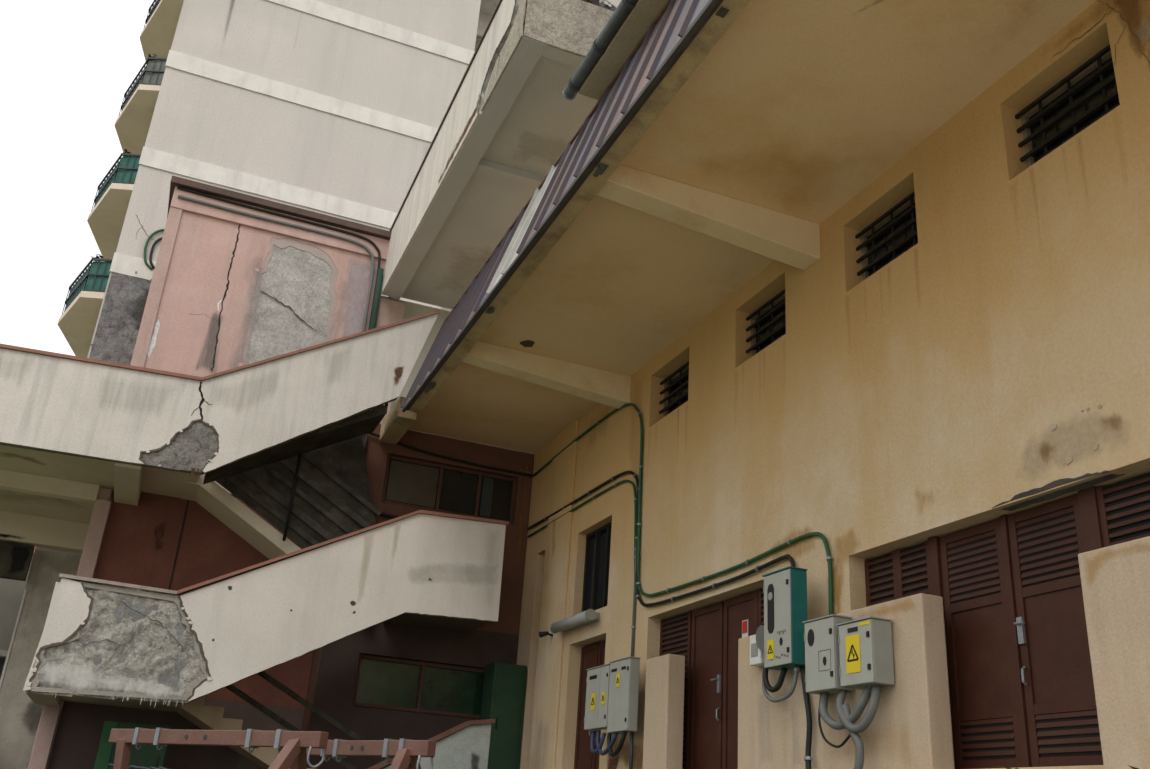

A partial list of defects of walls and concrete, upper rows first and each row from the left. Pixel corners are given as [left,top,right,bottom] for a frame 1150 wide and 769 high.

crack [477,0,516,114]
spalling [582,0,616,11]
crack [189,224,241,420]
peeling [238,236,338,367]
spalling [140,420,218,478]
spalling [26,581,212,708]
damp [25,702,44,730]